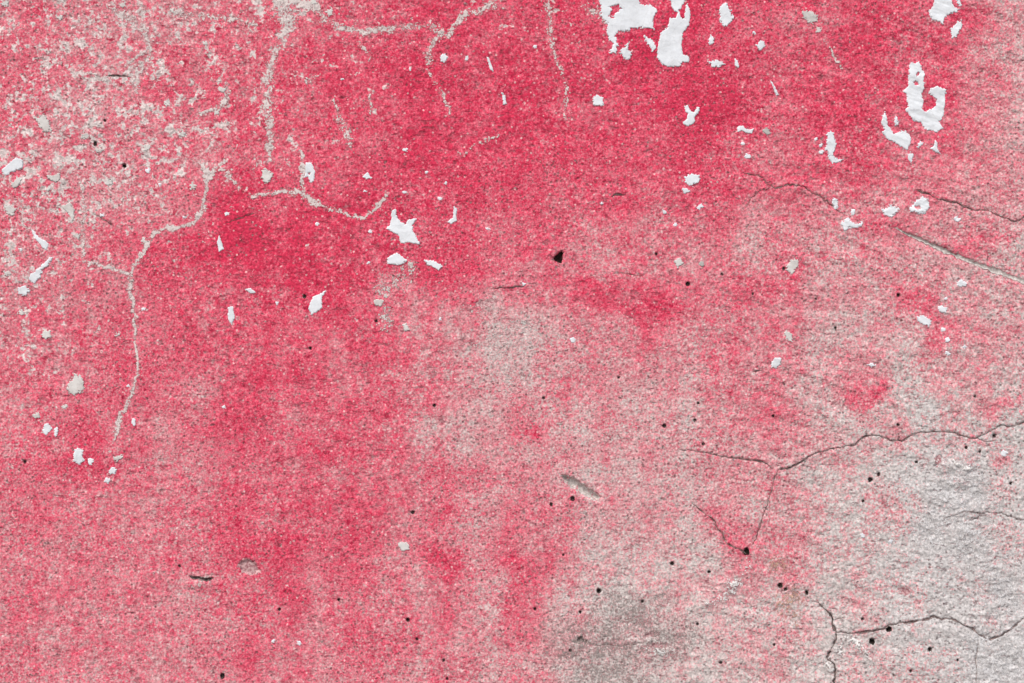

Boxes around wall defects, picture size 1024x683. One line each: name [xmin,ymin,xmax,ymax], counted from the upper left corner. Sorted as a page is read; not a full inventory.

peeling [599,0,691,67]
peeling [707,58,739,68]
peeling [719,2,734,27]
peeling [881,61,947,162]
peeling [819,131,844,164]
crack [743,172,840,212]
crack [918,190,1024,222]
peeling [18,230,53,296]
peeling [308,290,326,315]
peeling [373,209,443,332]
crack [680,422,1024,554]
crack [816,601,1023,683]